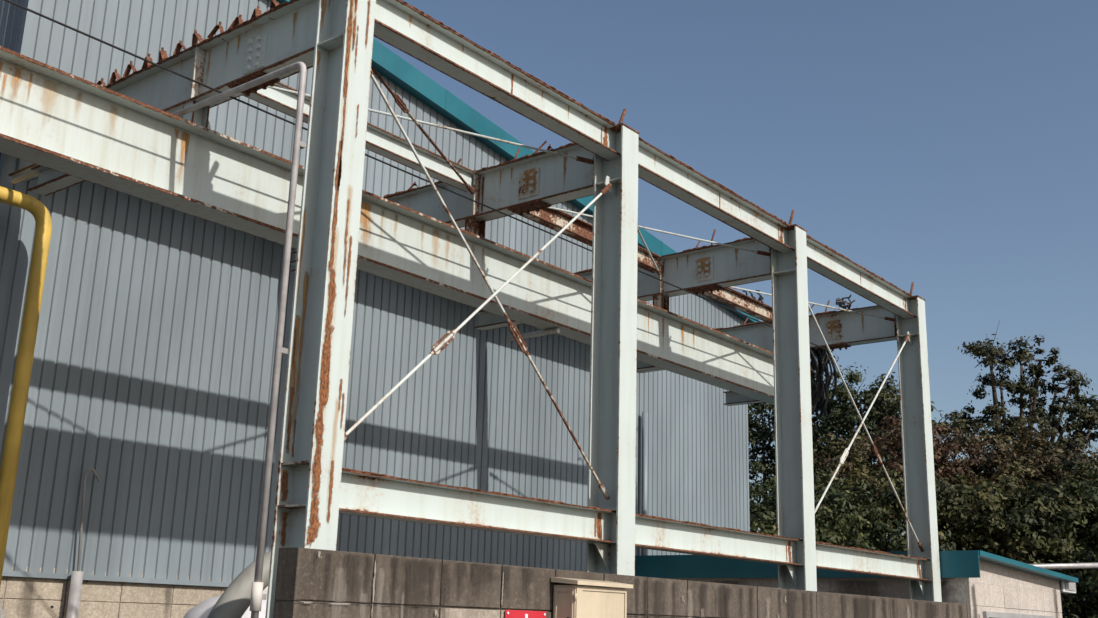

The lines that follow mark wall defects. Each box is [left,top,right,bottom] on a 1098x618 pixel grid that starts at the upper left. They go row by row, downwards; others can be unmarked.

rust [0,62,33,93]
rust [103,0,297,87]
rust [175,129,190,173]
rust [307,0,616,547]
rust [286,209,309,457]
rust [280,470,288,546]
leakage [719,586,752,618]
leakage [915,587,977,618]